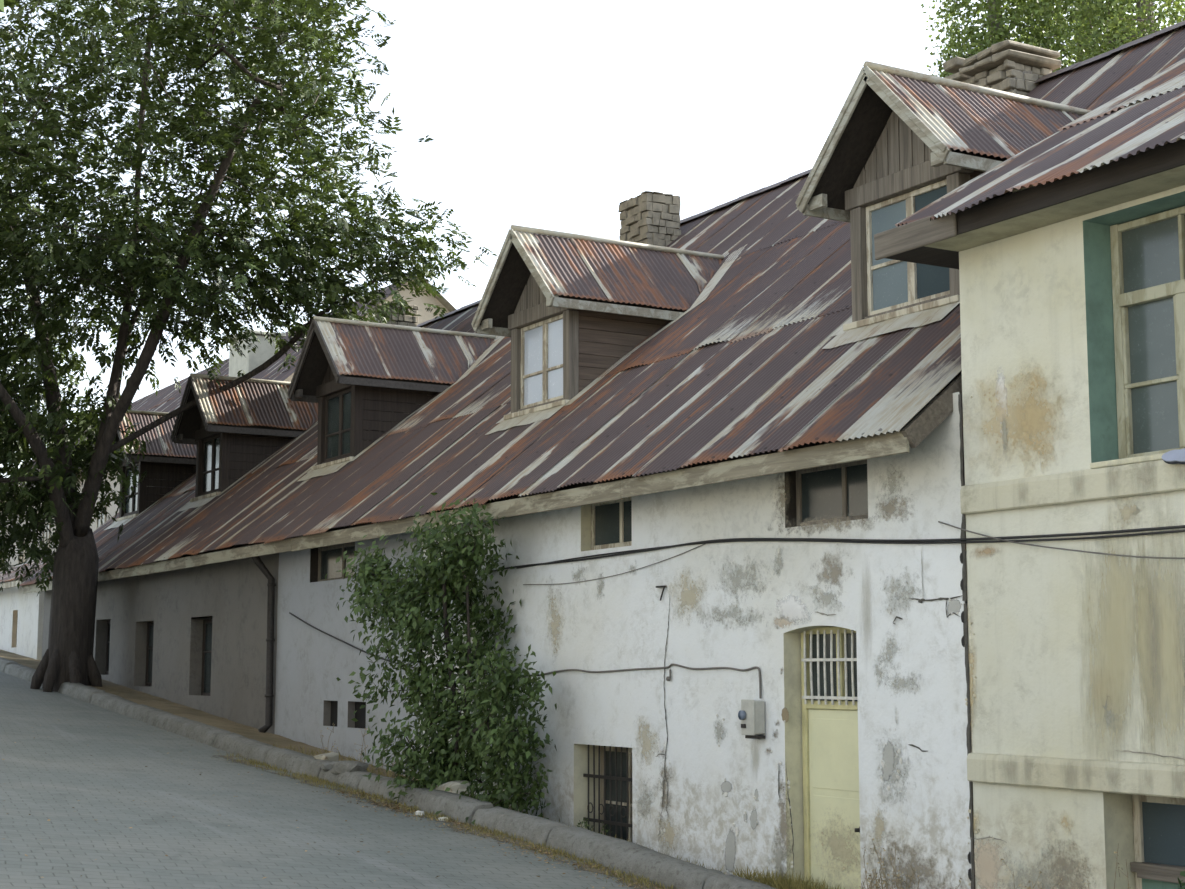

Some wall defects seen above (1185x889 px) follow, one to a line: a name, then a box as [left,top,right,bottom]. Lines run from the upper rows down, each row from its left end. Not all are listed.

damp [1090,553,1184,733]
peeling [880,741,903,790]